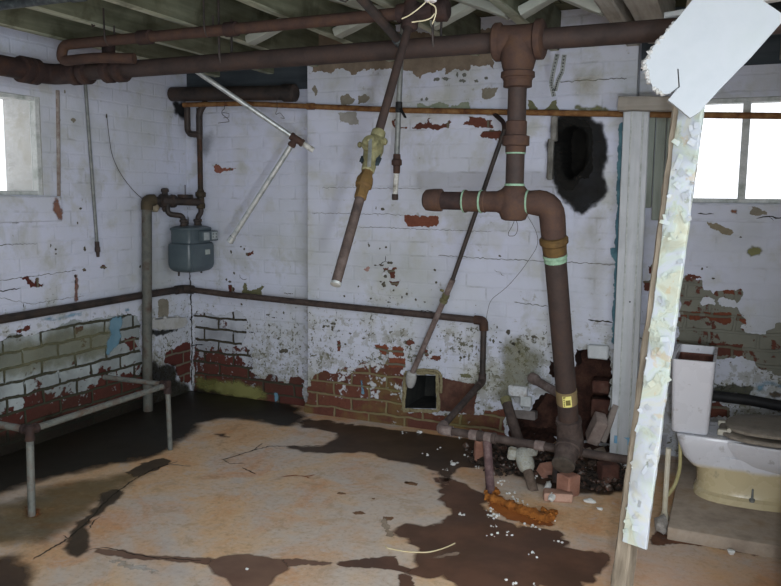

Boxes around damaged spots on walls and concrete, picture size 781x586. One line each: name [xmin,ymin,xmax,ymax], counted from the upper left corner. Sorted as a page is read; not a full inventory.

peeling [338,94,370,125]
peeling [312,53,498,99]
peeling [659,115,702,241]
peeling [0,312,143,435]
peeling [225,272,264,295]
peeling [164,303,512,437]
leakage [504,342,538,395]
spalling [517,393,558,443]
spalling [575,349,612,452]
peeling [643,258,781,388]
leakage [0,361,610,586]
leakage [578,457,625,495]